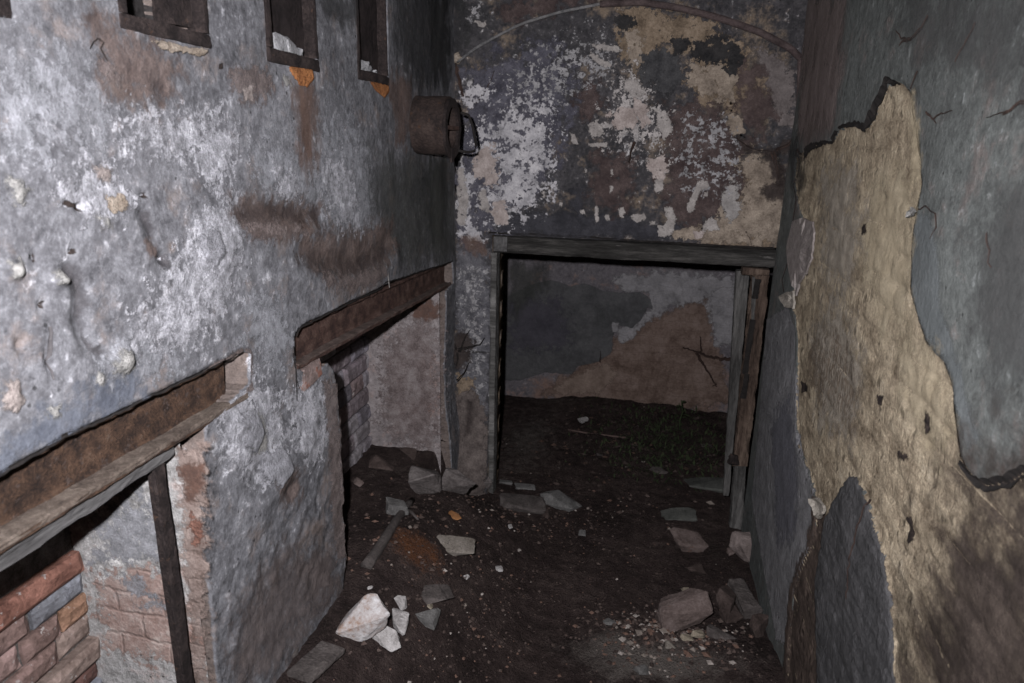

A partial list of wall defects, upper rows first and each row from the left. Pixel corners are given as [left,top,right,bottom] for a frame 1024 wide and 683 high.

spalling [173,438,214,683]
water stain [0,0,454,495]
spalling [371,1,1024,683]
crack [683,337,730,387]